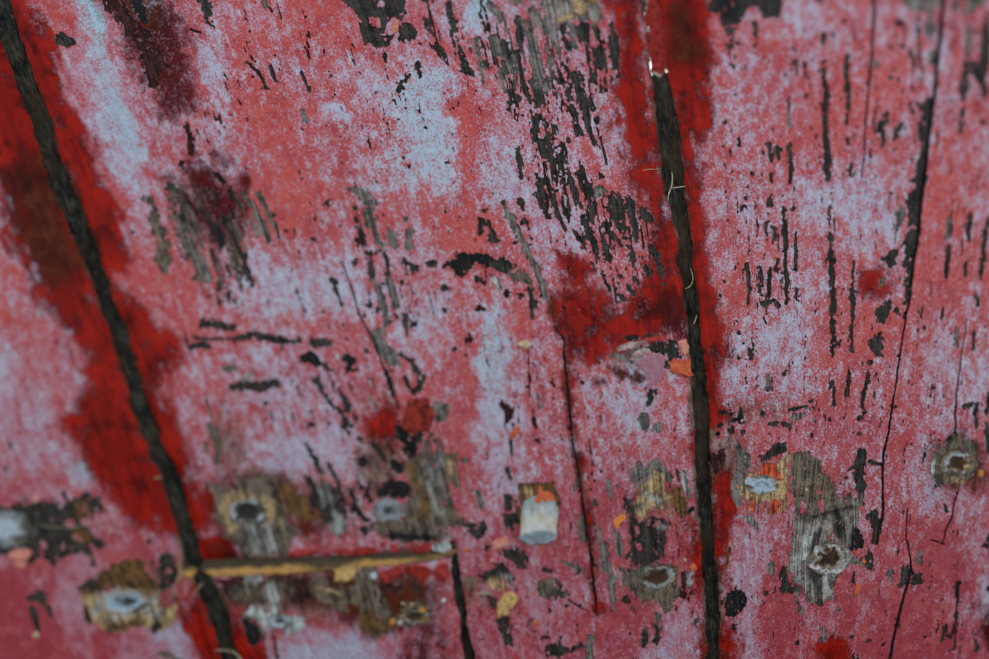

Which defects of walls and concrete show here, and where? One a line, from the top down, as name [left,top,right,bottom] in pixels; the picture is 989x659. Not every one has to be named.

crack [861,0,875,178]
peeling [0,489,178,638]
crack [554,326,597,616]
peeling [706,0,989,659]
crack [876,0,962,659]
crack [953,322,966,436]